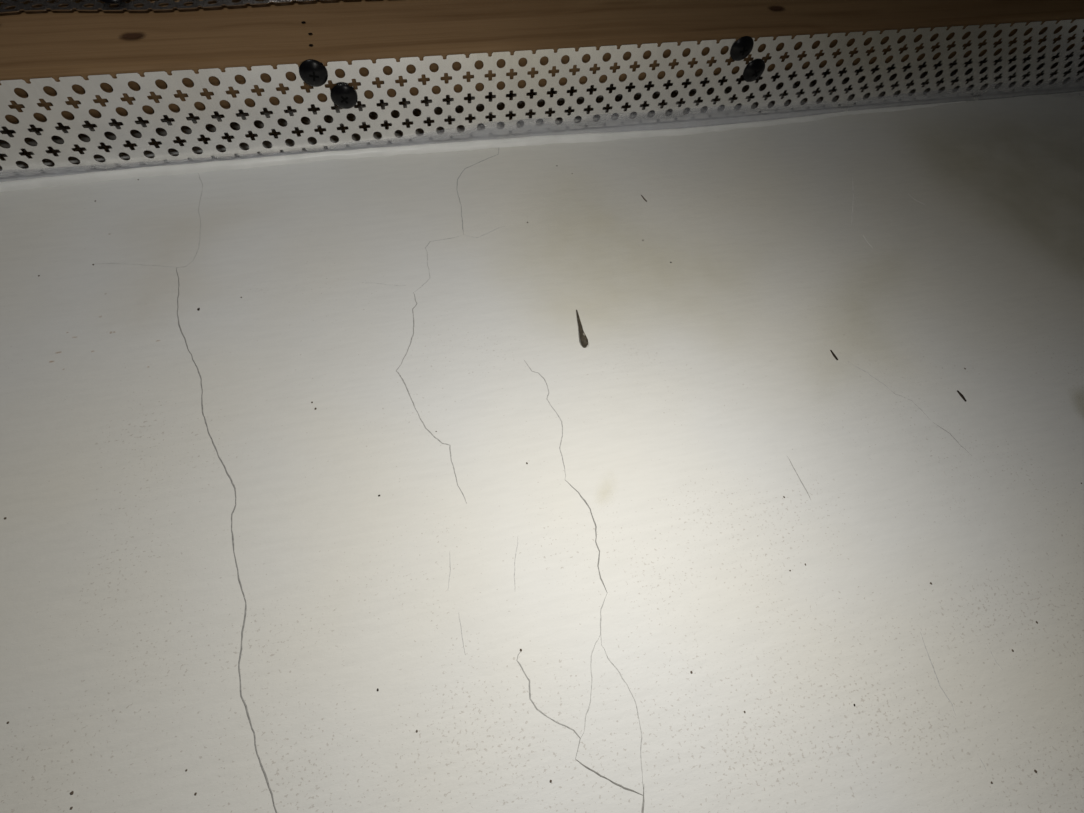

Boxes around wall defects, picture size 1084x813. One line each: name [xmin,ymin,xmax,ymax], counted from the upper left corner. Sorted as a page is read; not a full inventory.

crack [102,173,277,813]
crack [376,148,504,503]
crack [517,360,644,813]